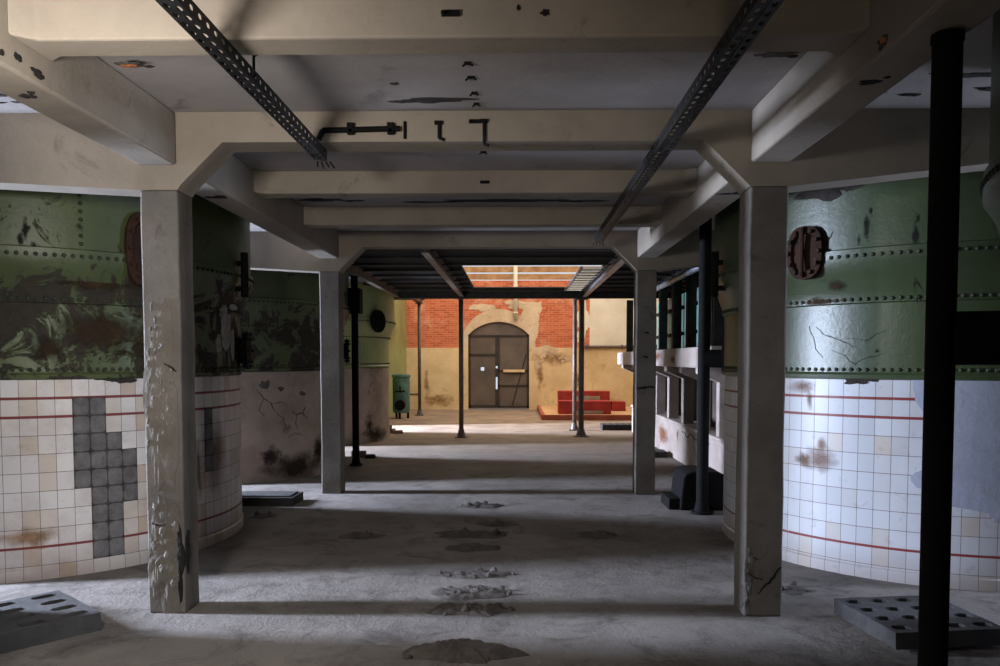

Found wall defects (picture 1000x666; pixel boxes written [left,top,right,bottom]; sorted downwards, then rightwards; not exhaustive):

peeling [469,300,579,374]
peeling [912,380,924,411]
water stain [264,441,322,478]
rust [799,441,827,465]
peeling [952,381,1000,522]
peeling [911,470,922,488]
spalling [177,523,191,602]